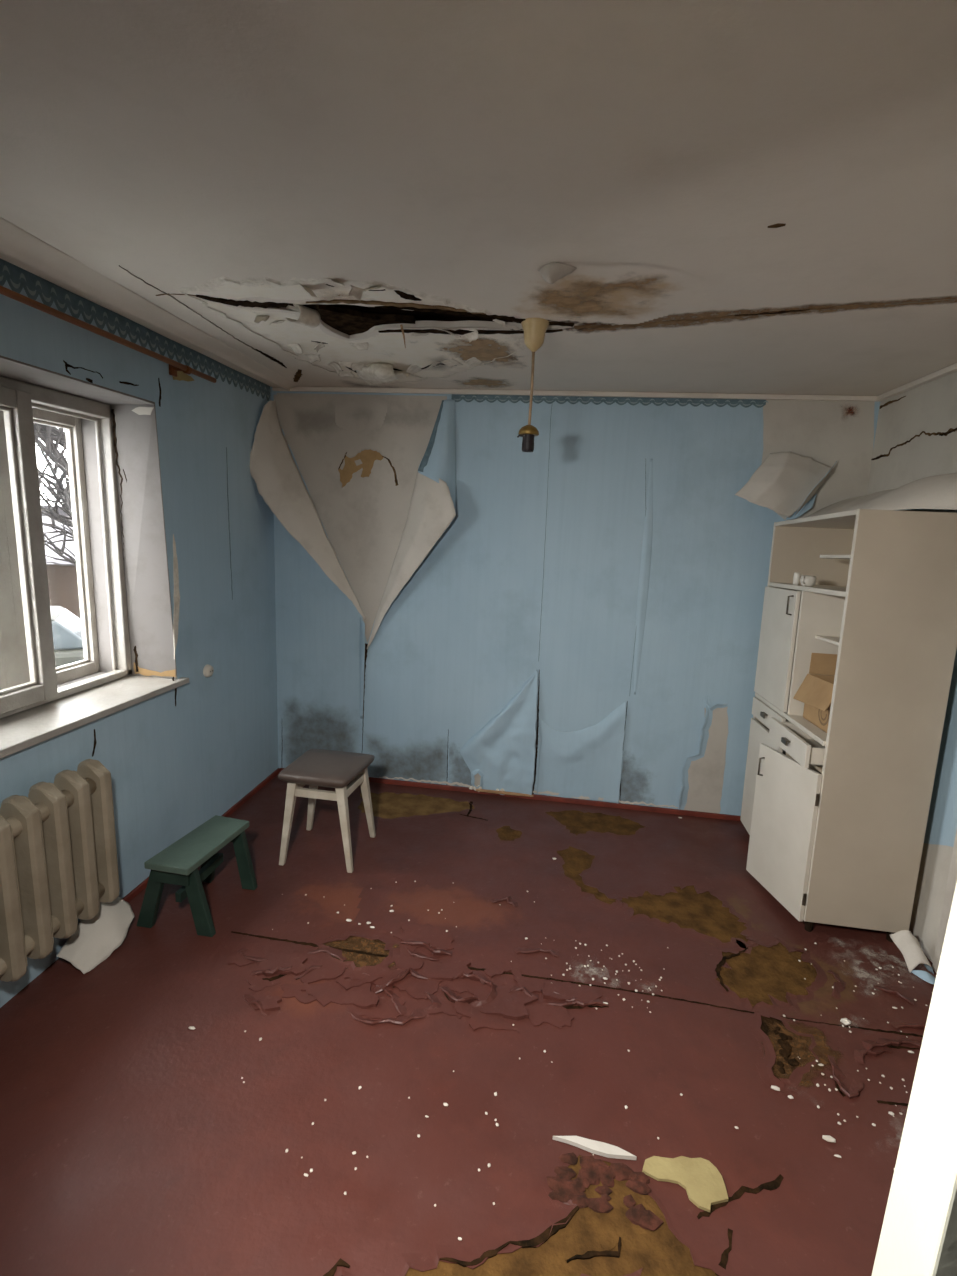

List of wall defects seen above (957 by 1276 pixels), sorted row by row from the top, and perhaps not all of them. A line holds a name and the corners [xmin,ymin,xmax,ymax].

leakage [499,263,713,331]
crack [574,297,957,332]
flaking render [157,271,532,643]
flaking render [761,400,875,520]
crack [880,396,906,409]
crack [871,428,957,460]
peeling [615,883,828,1097]
peeling [321,1145,738,1276]